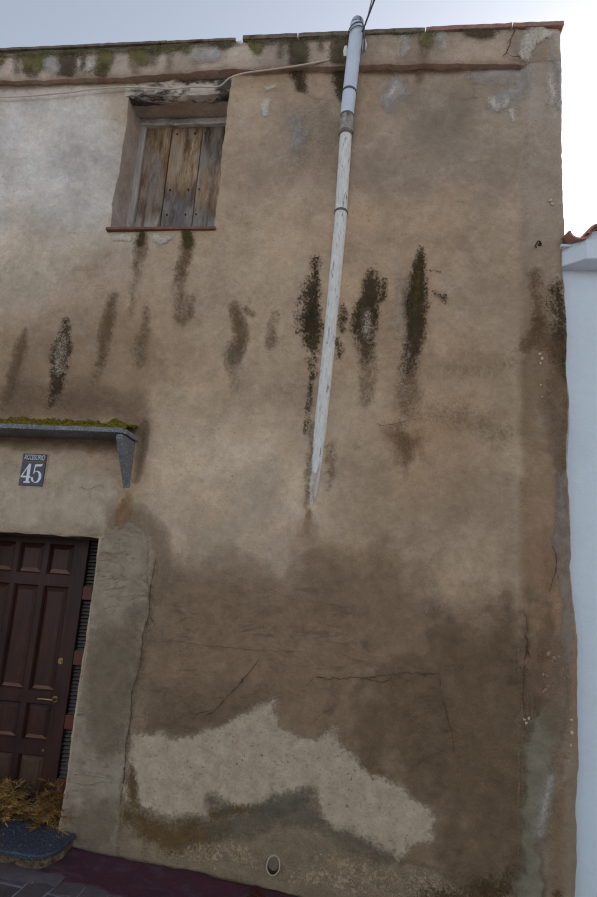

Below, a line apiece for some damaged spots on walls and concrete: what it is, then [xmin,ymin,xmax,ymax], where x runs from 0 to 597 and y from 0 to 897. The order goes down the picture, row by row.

water stain [0,34,349,102]
water stain [133,232,147,265]
water stain [1,316,98,409]
water stain [94,293,116,377]
water stain [228,302,254,374]
water stain [293,255,324,522]
water stain [334,269,388,402]
mould [399,245,448,406]
water stain [521,270,568,435]
water stain [72,509,538,897]
crack [307,672,456,753]
peeling [117,699,483,897]